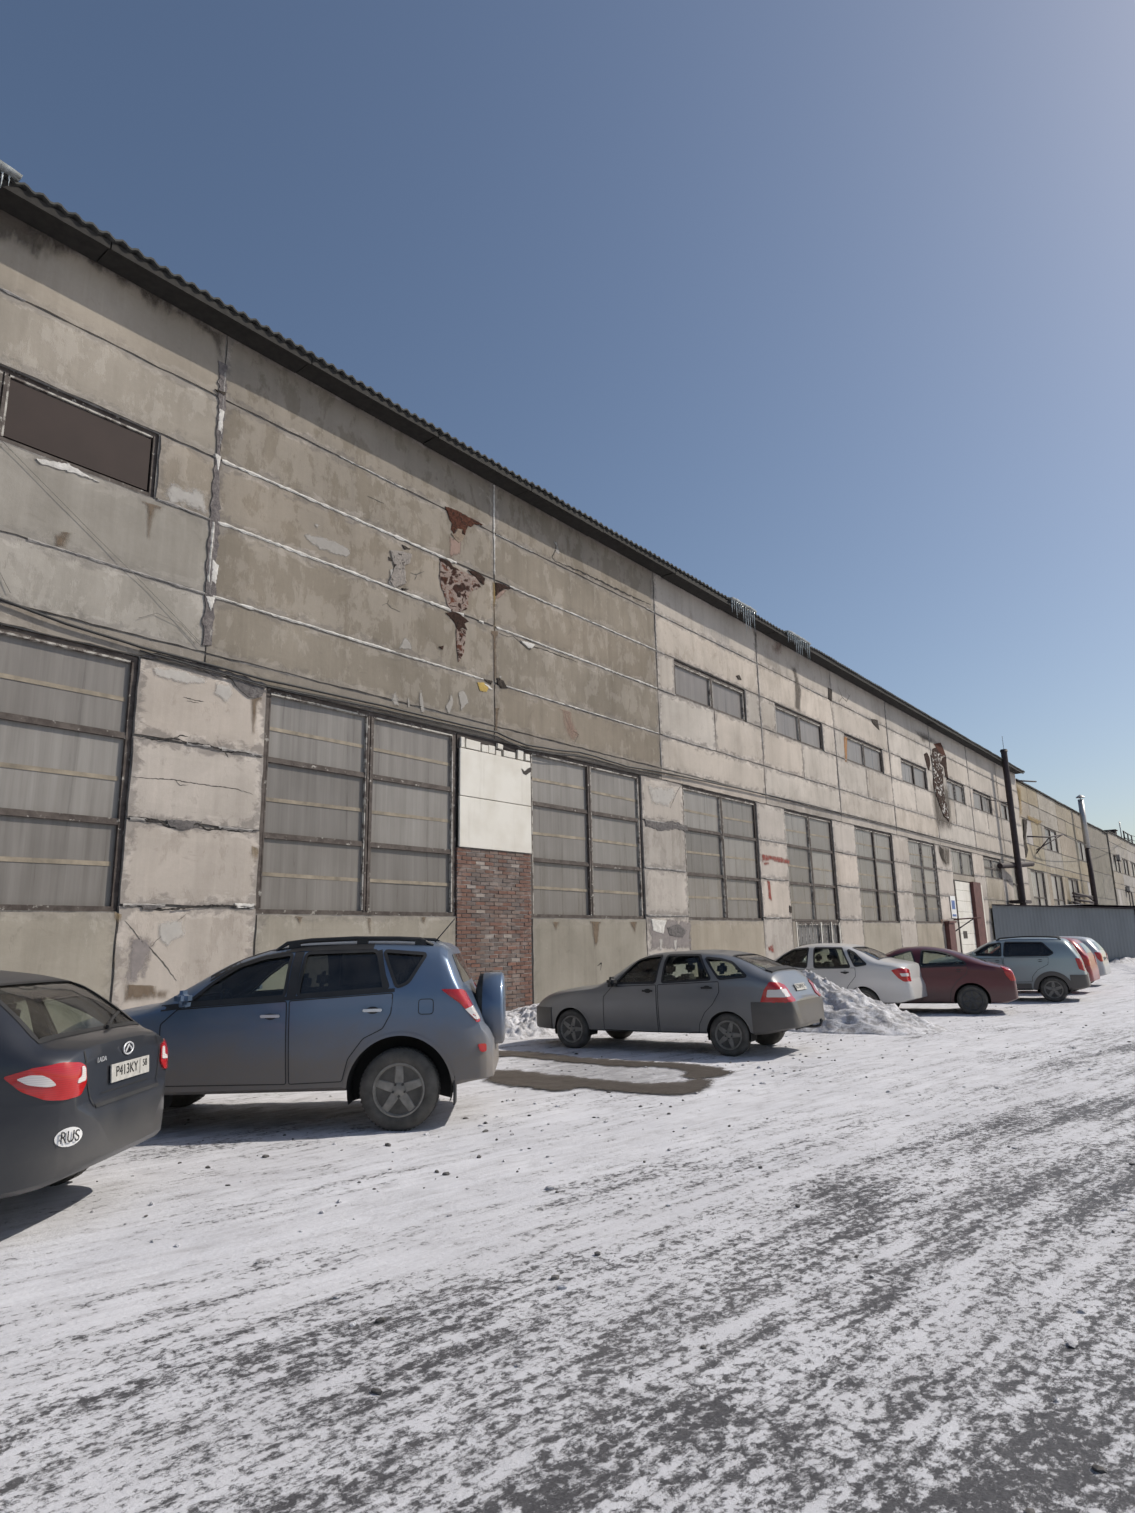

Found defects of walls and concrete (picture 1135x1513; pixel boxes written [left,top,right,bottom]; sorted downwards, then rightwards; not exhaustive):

spalling [439,506,511,662]
spalling [924,743,950,827]
spalling [939,846,949,865]